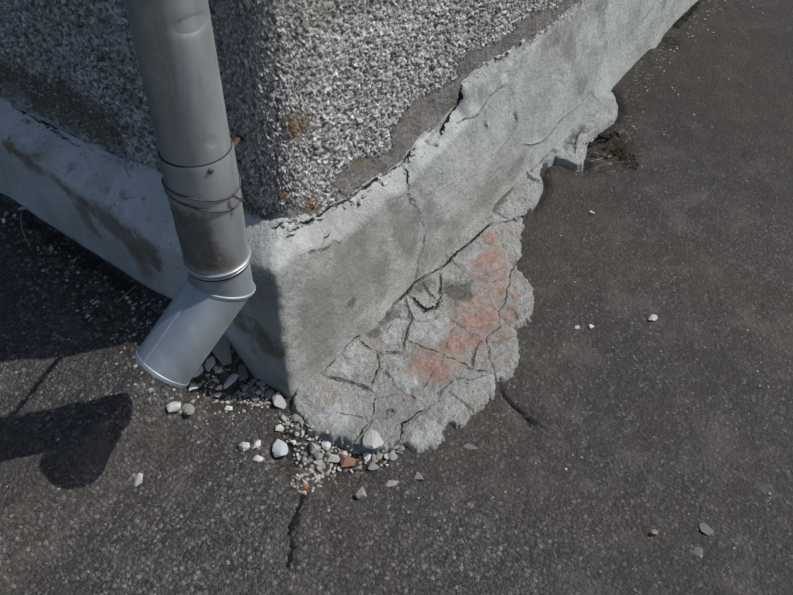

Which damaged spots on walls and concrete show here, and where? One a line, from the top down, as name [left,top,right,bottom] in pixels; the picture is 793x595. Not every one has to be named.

flaking render [334,0,581,210]
crack [440,85,596,179]
flaking render [267,190,326,235]
crack [268,148,540,446]
crack [288,489,306,570]